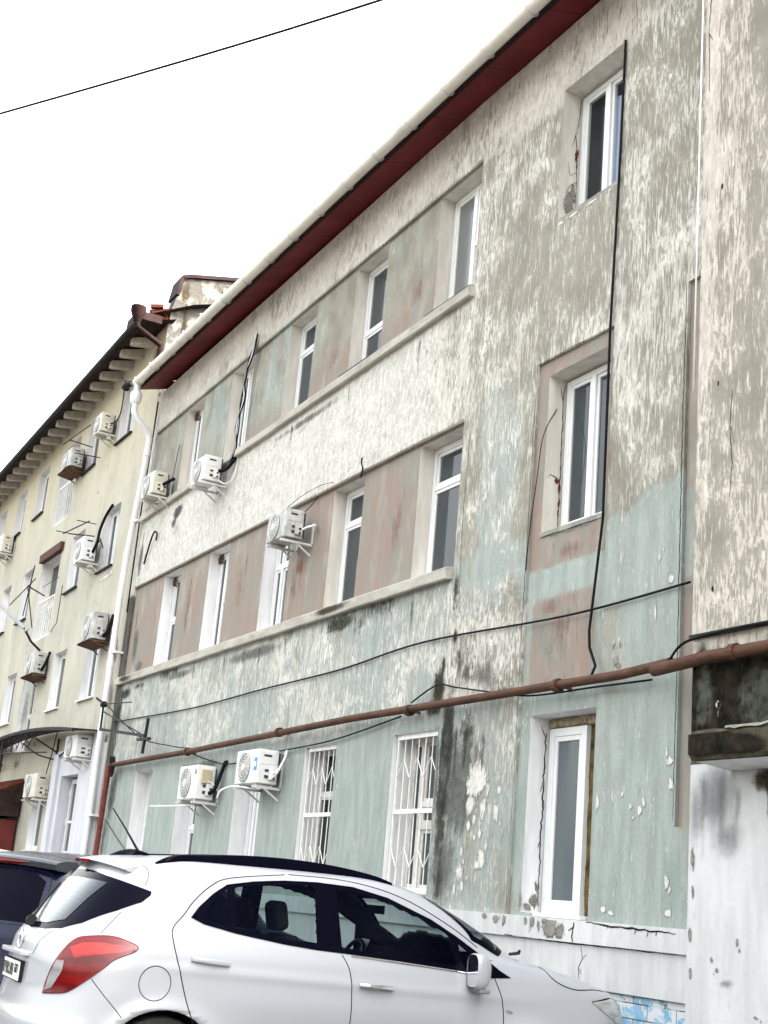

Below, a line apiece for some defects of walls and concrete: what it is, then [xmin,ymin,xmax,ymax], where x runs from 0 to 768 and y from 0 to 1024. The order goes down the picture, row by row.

crack [506,328,609,899]
leakage [458,654,491,682]
leakage [688,656,768,756]
leakage [433,706,484,897]
peeling [452,741,501,895]
peeling [665,747,674,790]
flaking render [524,882,564,942]
crack [504,920,675,978]